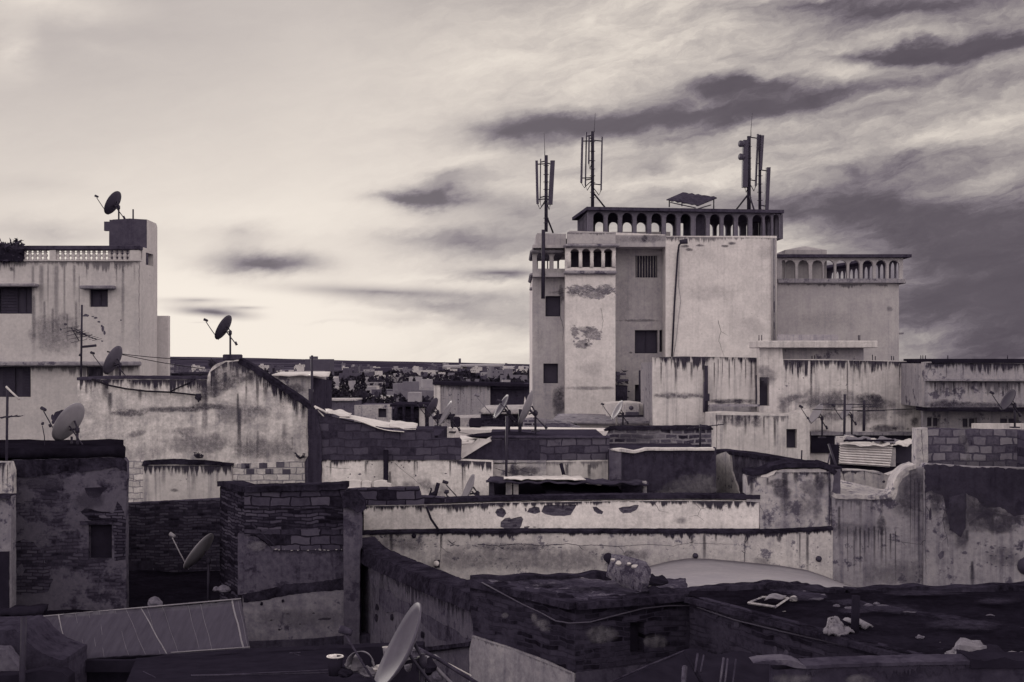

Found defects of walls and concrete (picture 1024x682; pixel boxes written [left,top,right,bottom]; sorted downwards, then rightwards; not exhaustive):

peeling [565,284,616,300]
peeling [571,326,602,349]
leakage [653,356,757,376]
leakage [783,360,907,384]
leakage [926,363,1024,389]
leakage [80,361,305,432]
leakage [712,399,757,425]
spalling [495,505,576,528]
spalling [619,505,639,513]
leakage [902,473,1022,545]